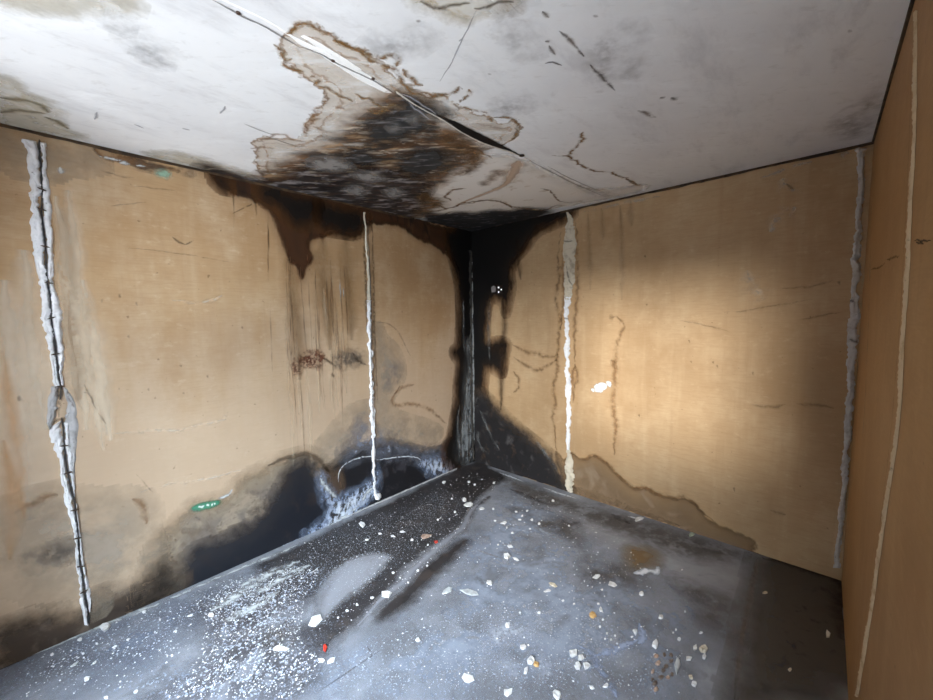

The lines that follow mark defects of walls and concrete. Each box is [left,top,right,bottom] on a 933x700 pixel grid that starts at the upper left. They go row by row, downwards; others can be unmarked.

crack [213,0,398,95]
rust [293,349,335,377]
crack [364,230,378,400]
damp [0,21,758,670]